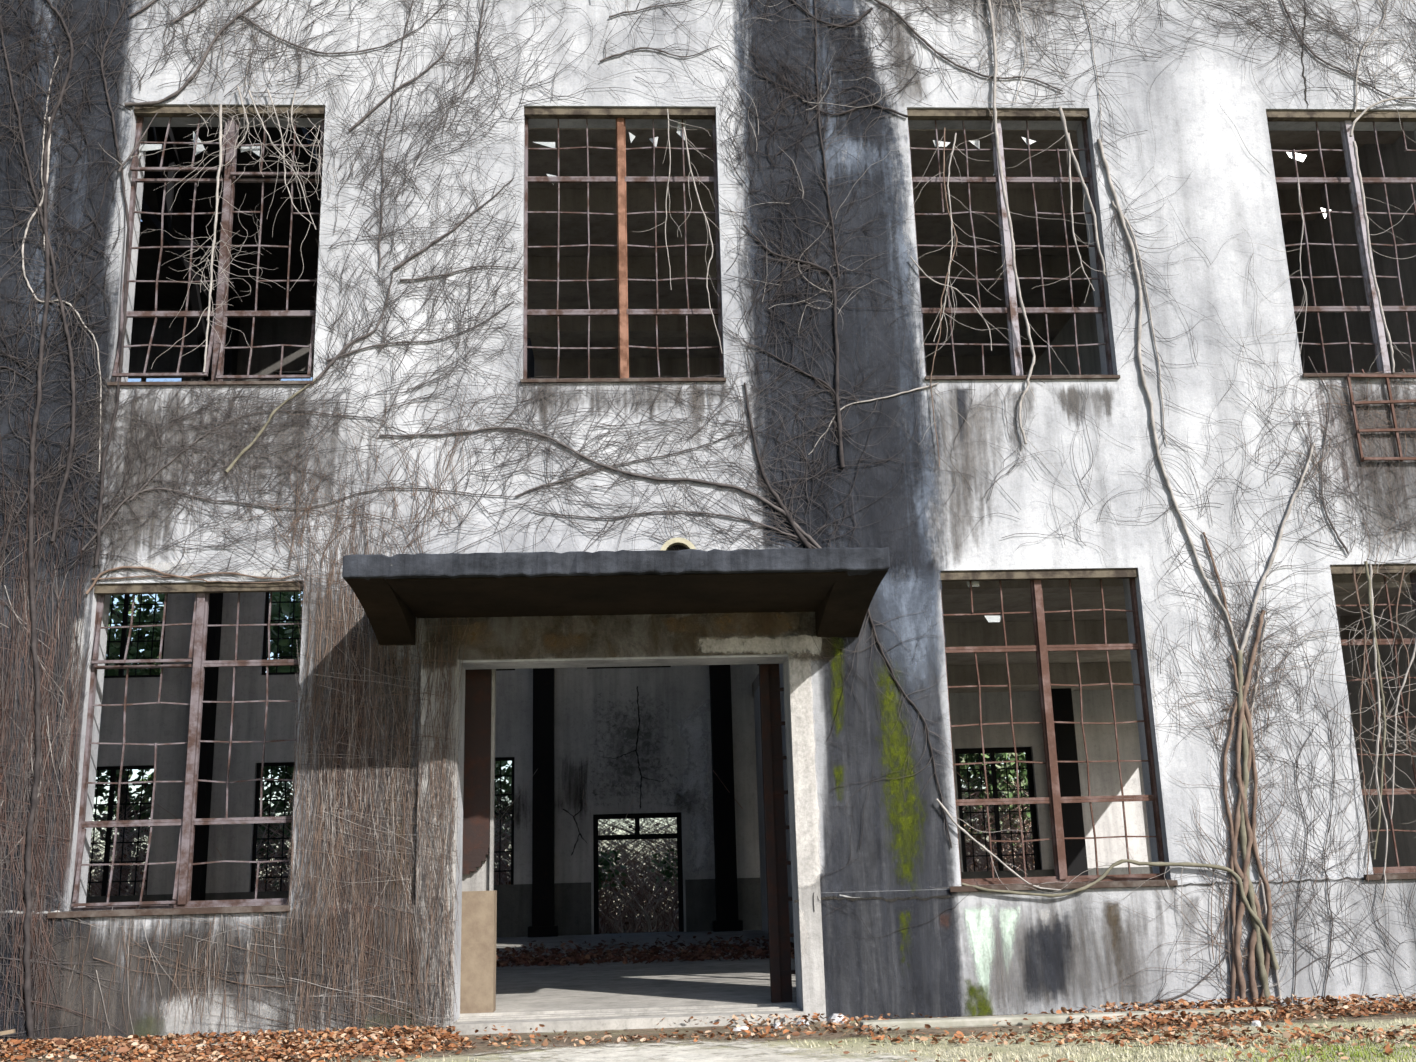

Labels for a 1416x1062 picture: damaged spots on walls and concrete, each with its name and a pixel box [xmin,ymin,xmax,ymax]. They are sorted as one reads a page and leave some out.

water stain [0,0,411,1047]
crack [609,686,667,808]
water stain [734,0,1143,1021]
rust [1308,378,1416,551]